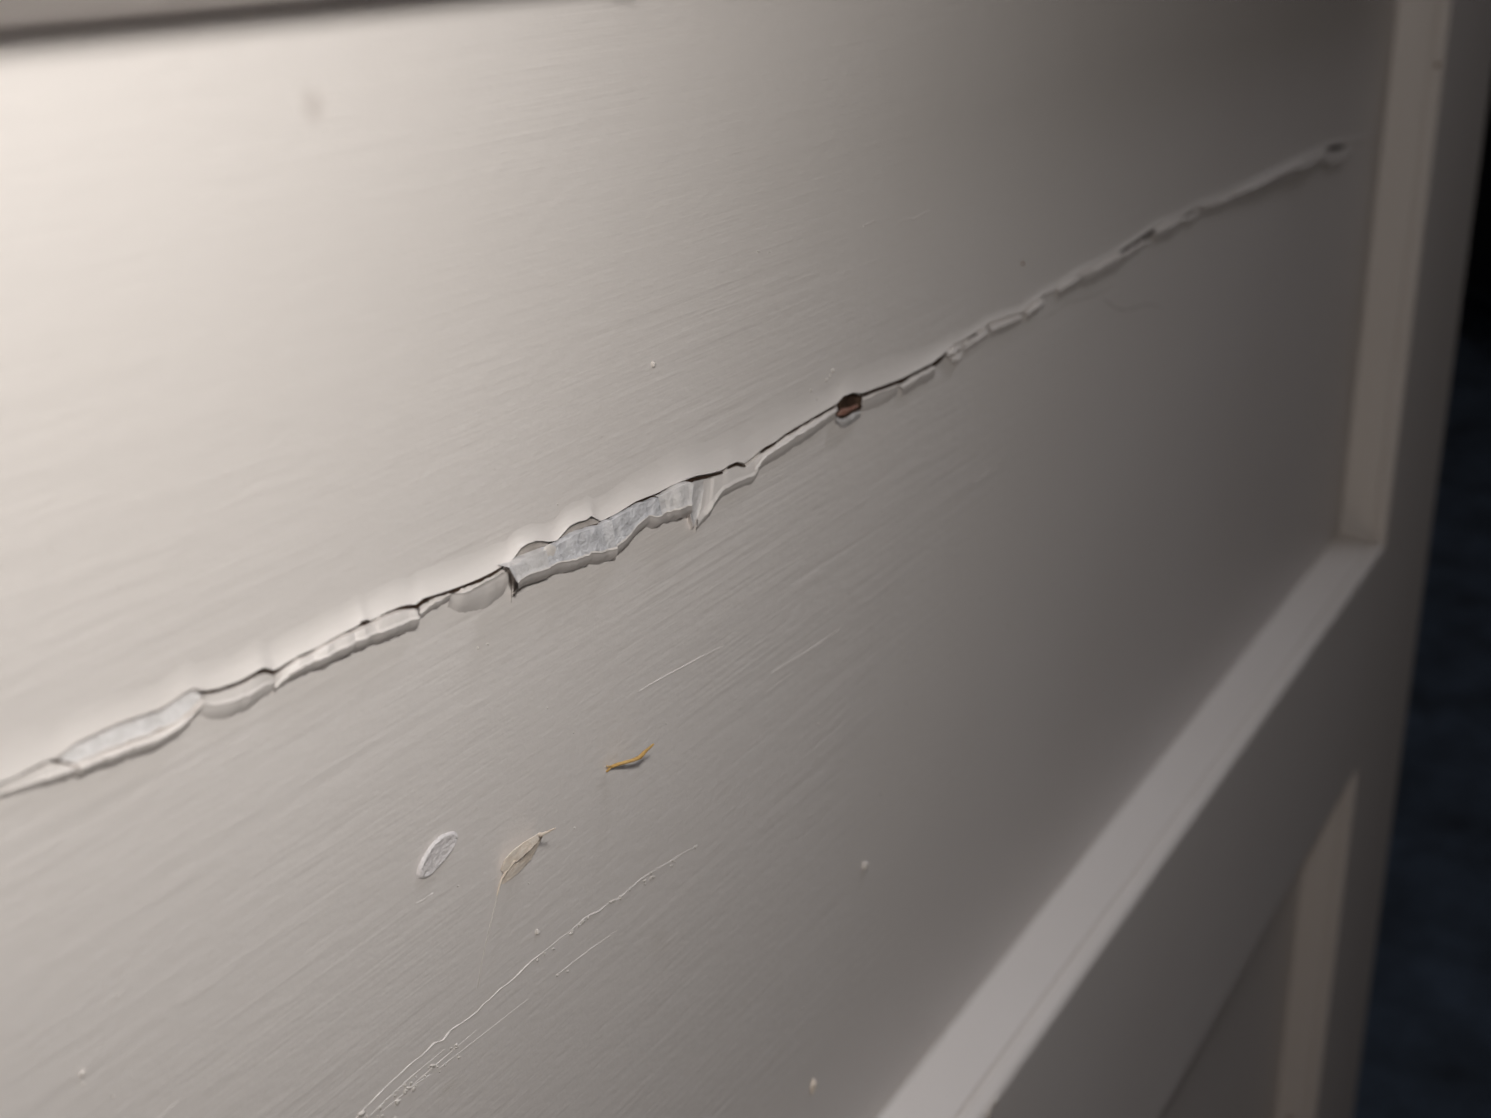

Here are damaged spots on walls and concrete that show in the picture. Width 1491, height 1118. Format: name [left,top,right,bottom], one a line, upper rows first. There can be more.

crack [0,128,1383,798]